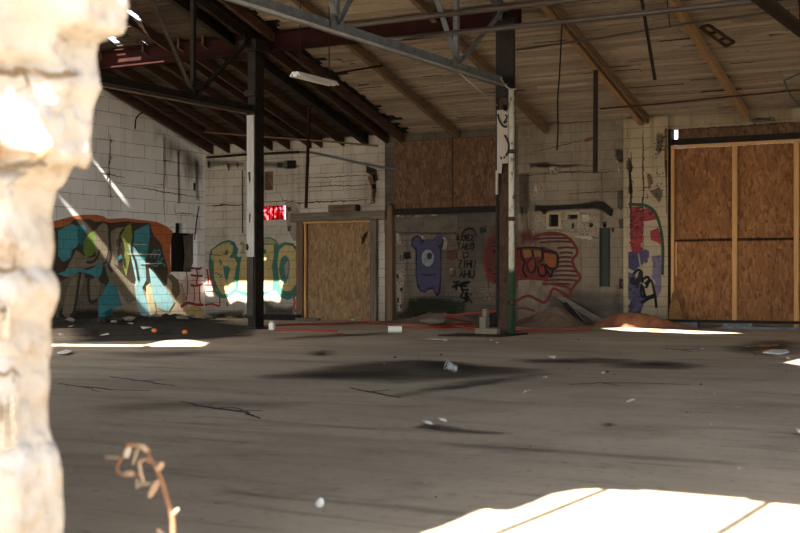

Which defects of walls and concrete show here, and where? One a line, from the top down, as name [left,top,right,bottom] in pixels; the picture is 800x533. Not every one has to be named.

crack [105,137,242,216]
damp [170,143,198,199]
spalling [366,166,378,189]
crack [517,132,652,246]
peeling [644,172,663,202]
crack [58,377,262,419]